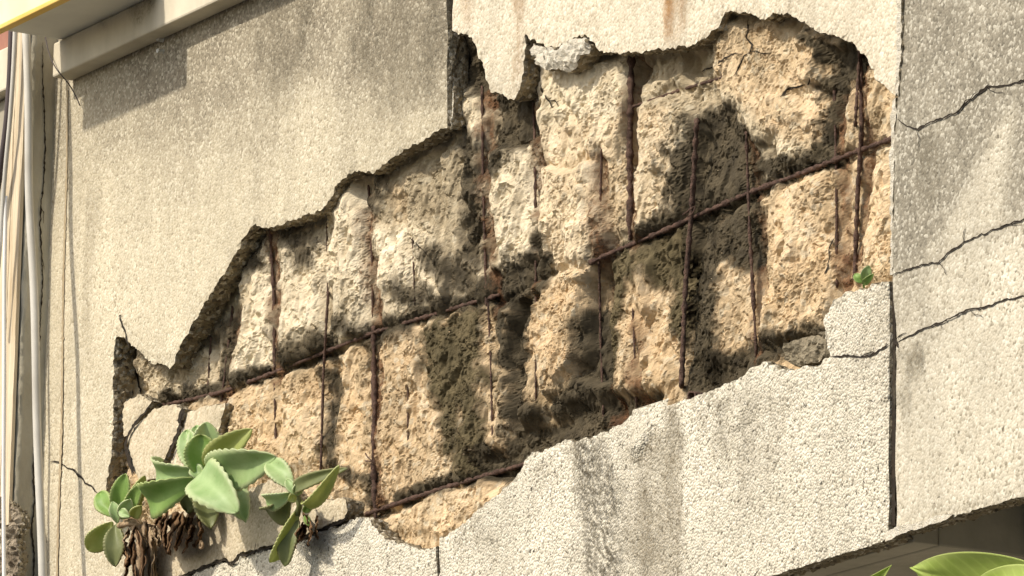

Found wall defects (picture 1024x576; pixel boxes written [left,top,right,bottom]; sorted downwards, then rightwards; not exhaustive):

corrosion [863,65,877,208]
crack [898,79,1024,146]
corrosion [269,236,284,383]
spalling [122,0,905,576]
corrosion [587,155,610,267]
corrosion [838,246,864,293]
crack [831,295,1024,358]
crack [893,219,1024,275]
crack [31,447,97,576]
spalling [885,513,955,542]